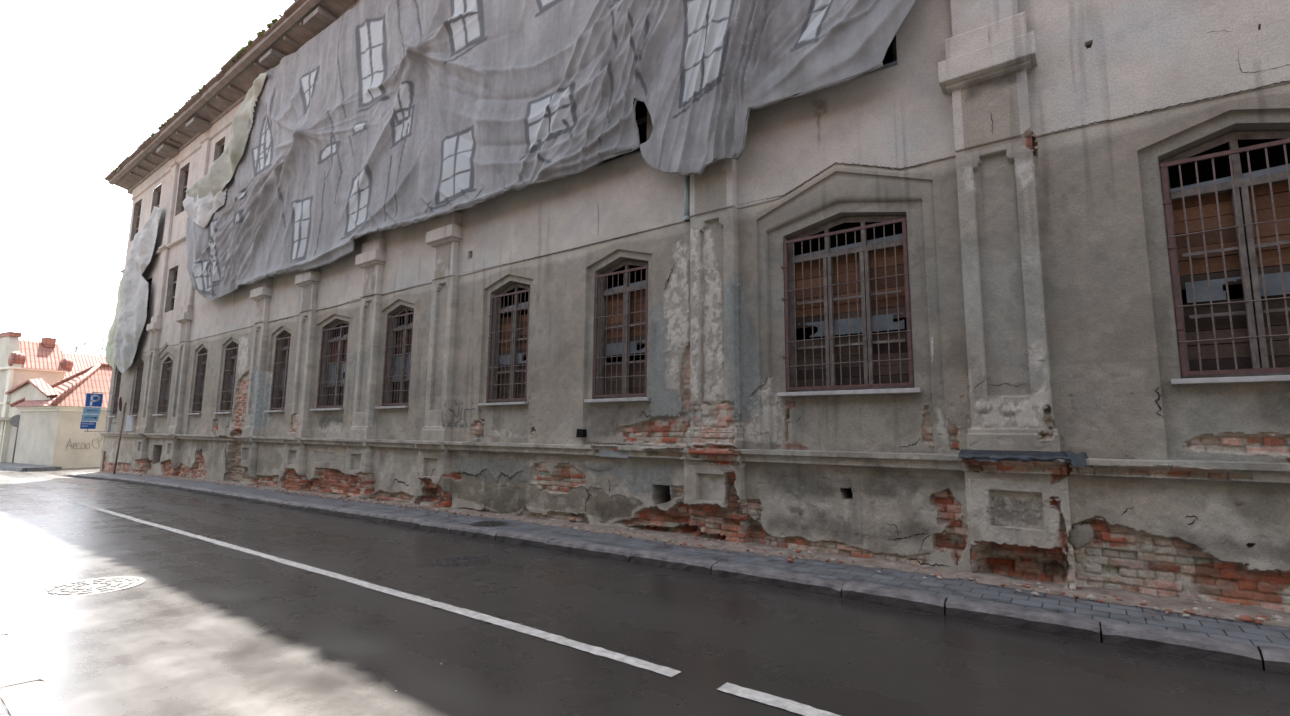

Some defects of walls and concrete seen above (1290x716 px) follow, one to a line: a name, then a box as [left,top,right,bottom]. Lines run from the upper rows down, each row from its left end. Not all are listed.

spalling [100,449,207,479]
spalling [211,335,494,513]
spalling [469,223,1290,613]